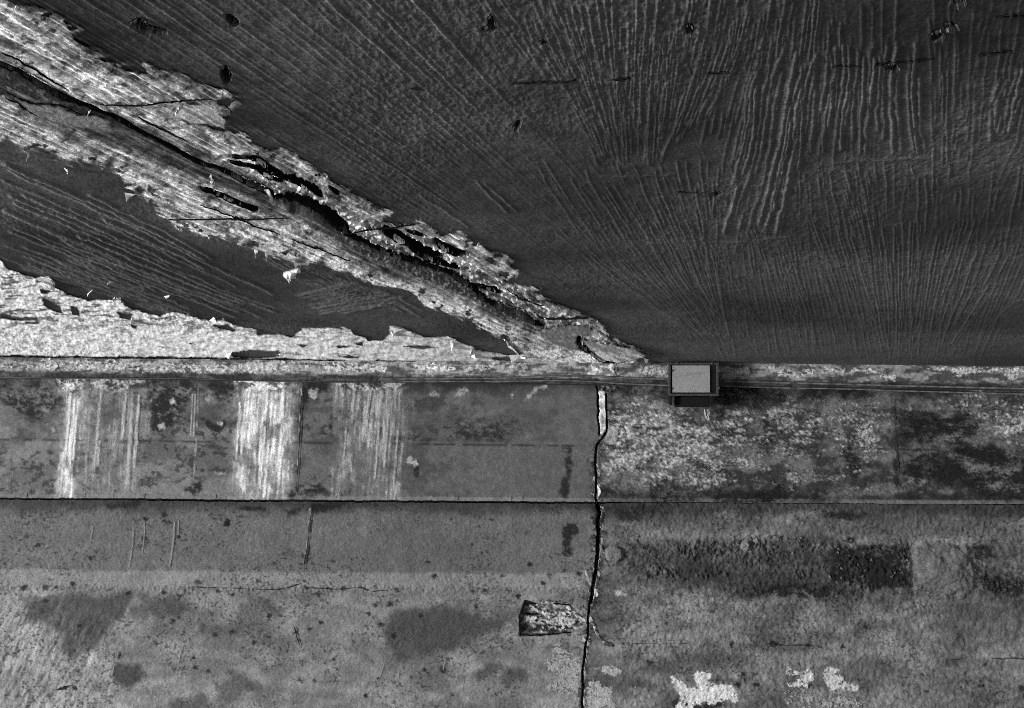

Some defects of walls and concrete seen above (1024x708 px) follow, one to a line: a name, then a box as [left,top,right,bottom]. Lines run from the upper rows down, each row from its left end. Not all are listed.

peeling [0,0,651,365]
water stain [57,379,145,497]
water stain [236,380,292,497]
crack [0,53,648,708]
water stain [335,383,403,494]
water stain [27,594,183,655]
water stain [386,609,501,679]
spalling [515,594,587,644]